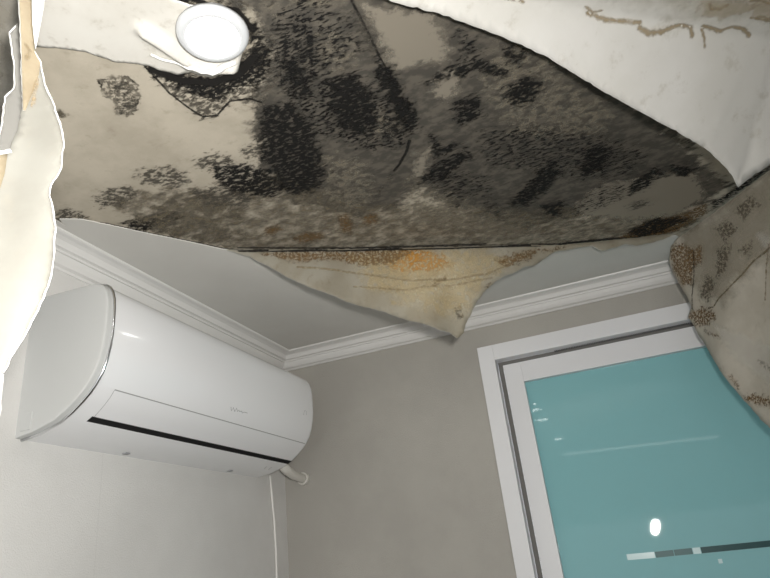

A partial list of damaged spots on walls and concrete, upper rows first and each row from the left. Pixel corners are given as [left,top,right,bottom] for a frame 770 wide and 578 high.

water stain [0,0,18,126]
water stain [95,0,751,302]
water stain [55,209,88,222]